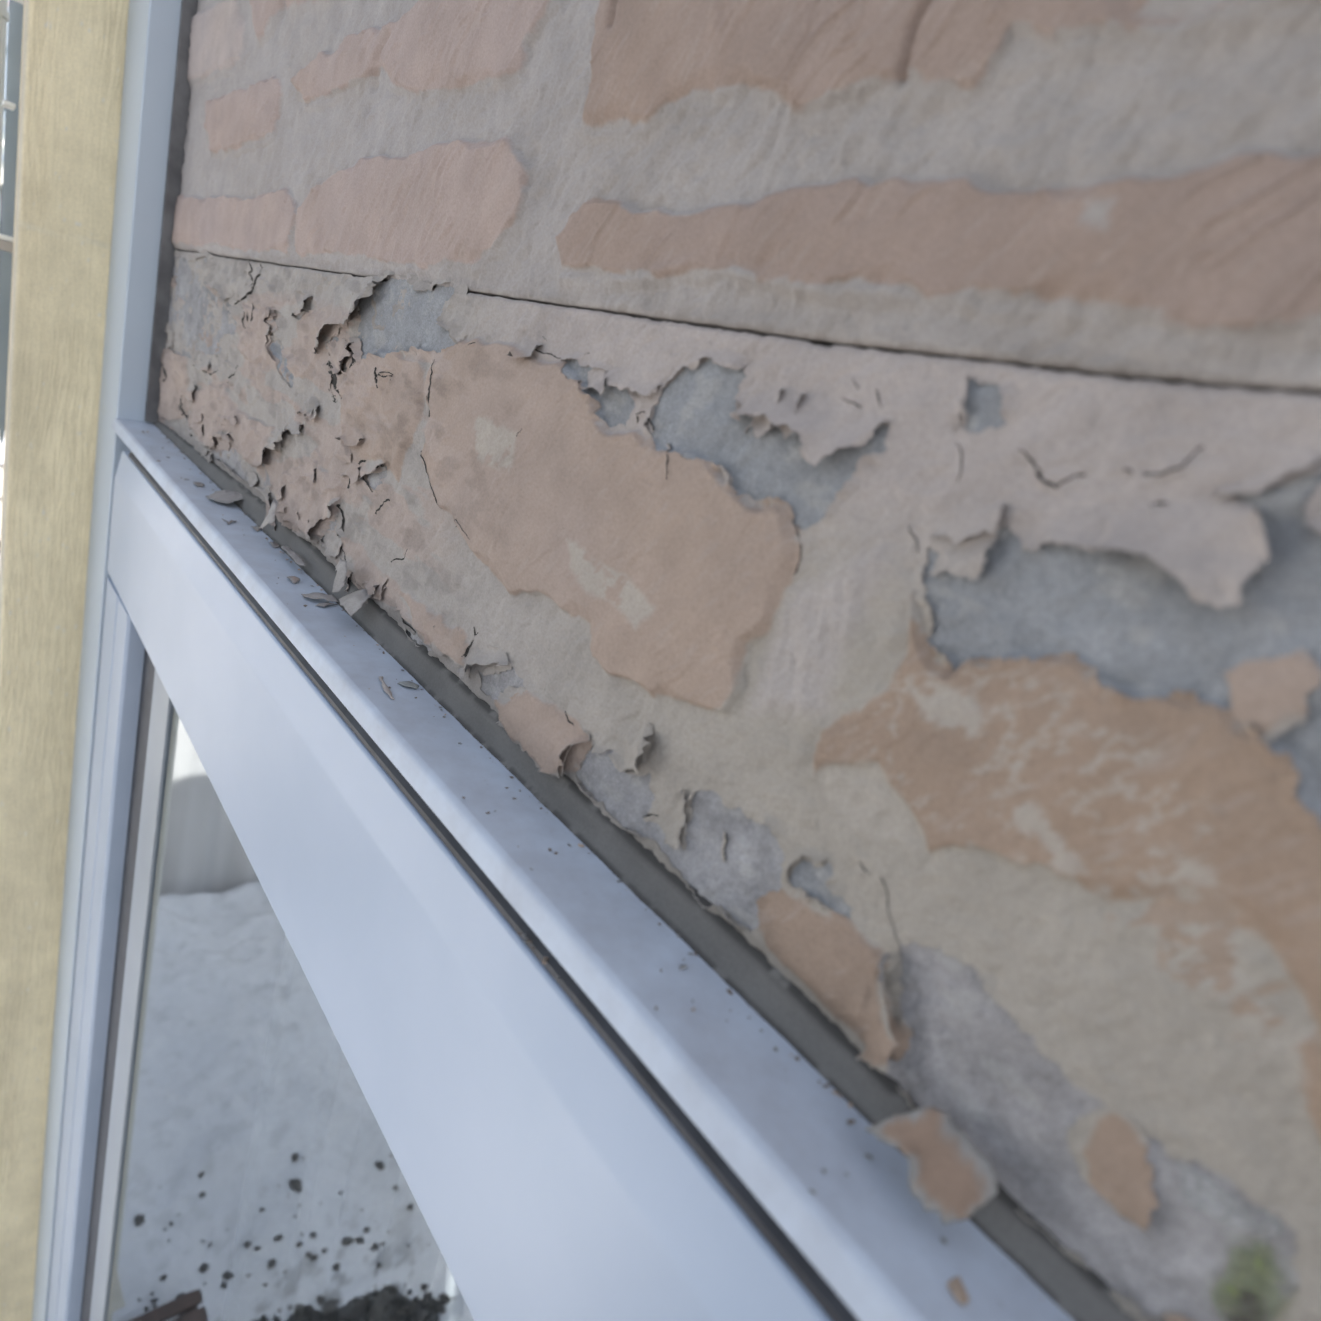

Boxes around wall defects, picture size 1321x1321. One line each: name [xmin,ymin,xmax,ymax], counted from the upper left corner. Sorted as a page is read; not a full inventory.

crack [228,260,262,329]
crack [161,364,192,437]
crack [322,350,393,403]
crack [419,359,469,541]
crack [332,460,392,590]
crack [391,549,409,564]
peeling [162,251,897,942]
peeling [911,445,1321,847]
peeling [853,933,1321,1321]